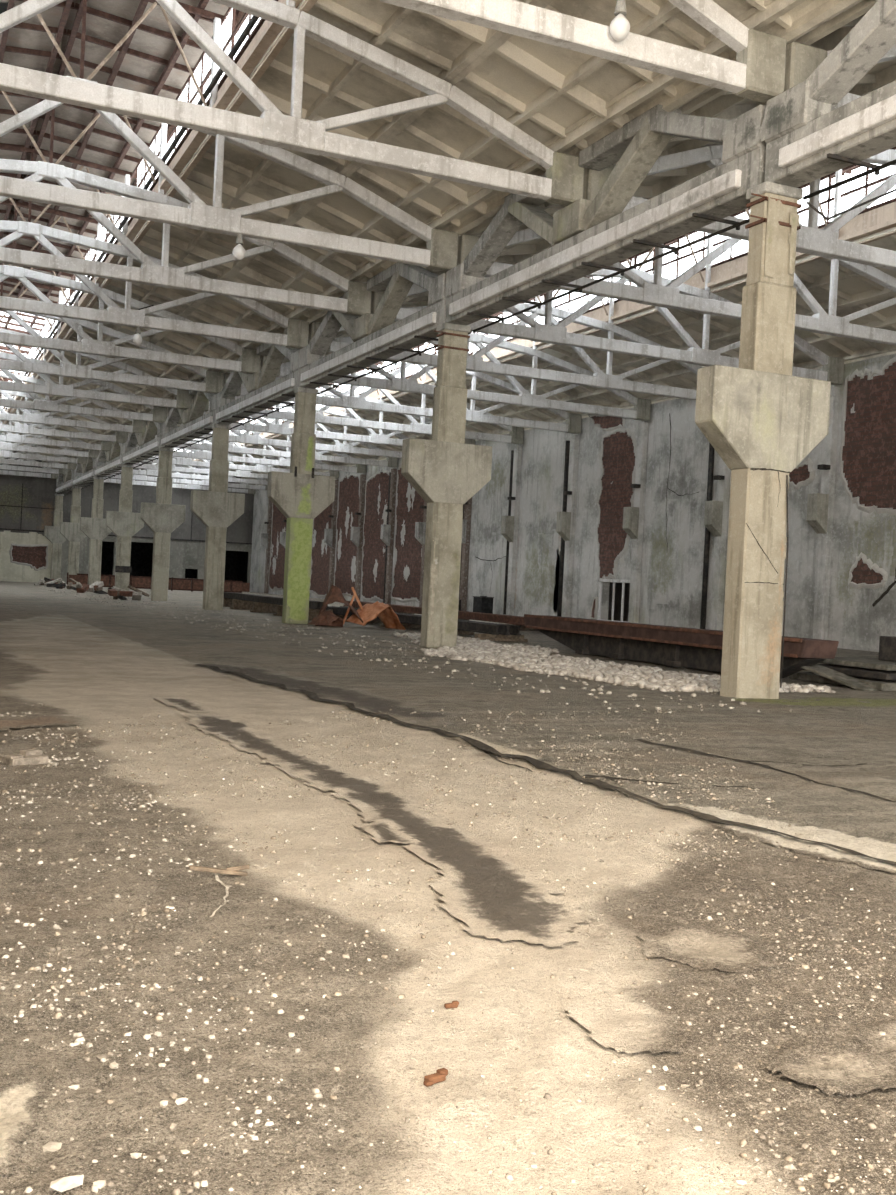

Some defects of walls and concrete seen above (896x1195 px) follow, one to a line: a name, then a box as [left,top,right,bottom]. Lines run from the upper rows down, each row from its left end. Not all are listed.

spalling [9,543,49,571]
spalling [310,464,438,635]
spalling [588,414,637,582]
spalling [829,357,896,515]
spalling [848,552,888,590]
damp [155,697,595,947]